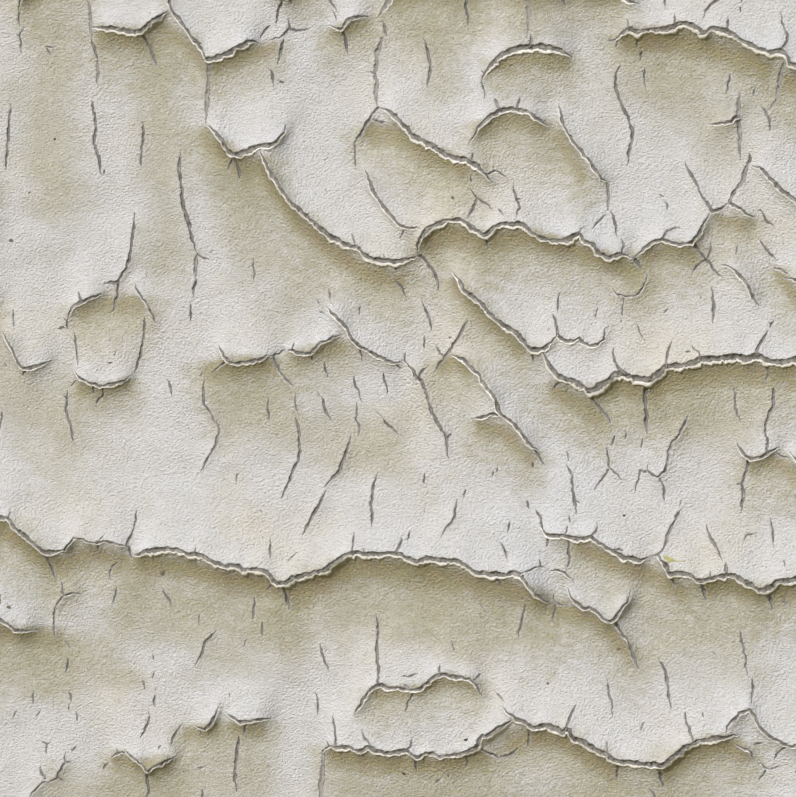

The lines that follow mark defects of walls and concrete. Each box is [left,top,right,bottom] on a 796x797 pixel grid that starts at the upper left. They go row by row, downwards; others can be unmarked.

crack [16,0,25,51]
crack [4,107,12,167]
crack [81,0,796,536]
crack [2,311,53,375]
crack [63,212,158,441]
crack [0,451,796,673]
crack [30,742,76,797]
crack [140,653,155,737]
crack [103,702,272,797]
crack [315,614,796,797]